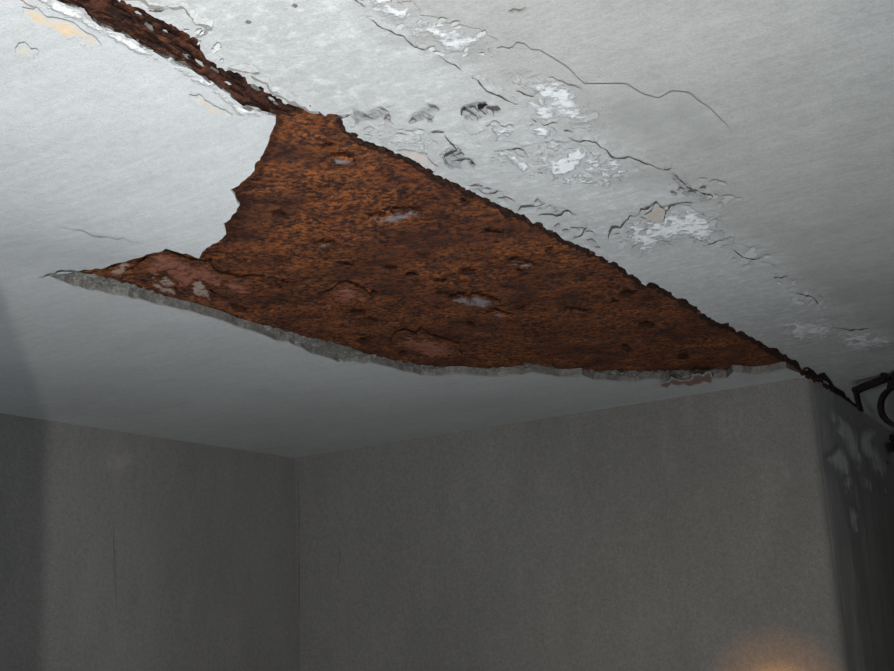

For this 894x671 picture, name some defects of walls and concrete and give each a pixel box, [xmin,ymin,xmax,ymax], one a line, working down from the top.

corrosion [21,0,301,122]
flaking render [124,0,214,45]
peeling [363,0,497,64]
crack [355,0,715,241]
flaking render [56,43,828,382]
corrosion [650,372,713,389]